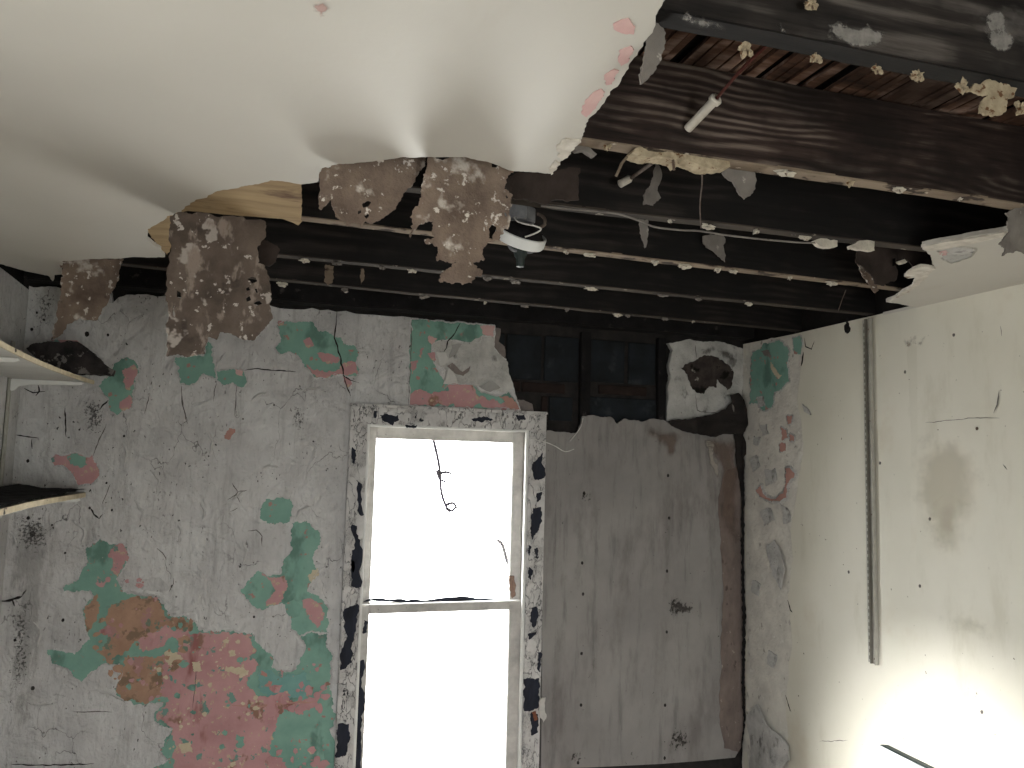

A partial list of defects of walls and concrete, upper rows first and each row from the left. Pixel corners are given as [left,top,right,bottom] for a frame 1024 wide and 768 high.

flaking render [549,138,581,175]
peeling [97,355,141,417]
peeling [274,320,361,387]
crack [334,314,359,396]
peeling [373,411,417,428]
peeling [407,318,534,423]
peeling [51,451,108,487]
peeling [528,453,546,580]
peeling [742,334,811,768]
peeling [47,480,368,768]
peeling [528,606,539,640]
peeling [523,652,547,736]